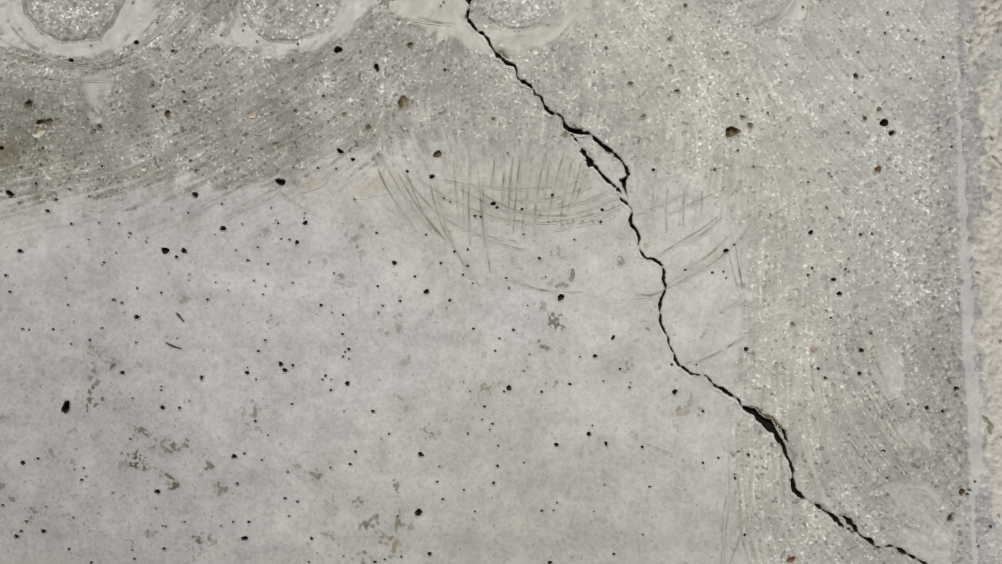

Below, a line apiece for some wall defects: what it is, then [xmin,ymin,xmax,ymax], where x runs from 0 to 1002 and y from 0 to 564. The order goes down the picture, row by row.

crack [465,0,928,564]